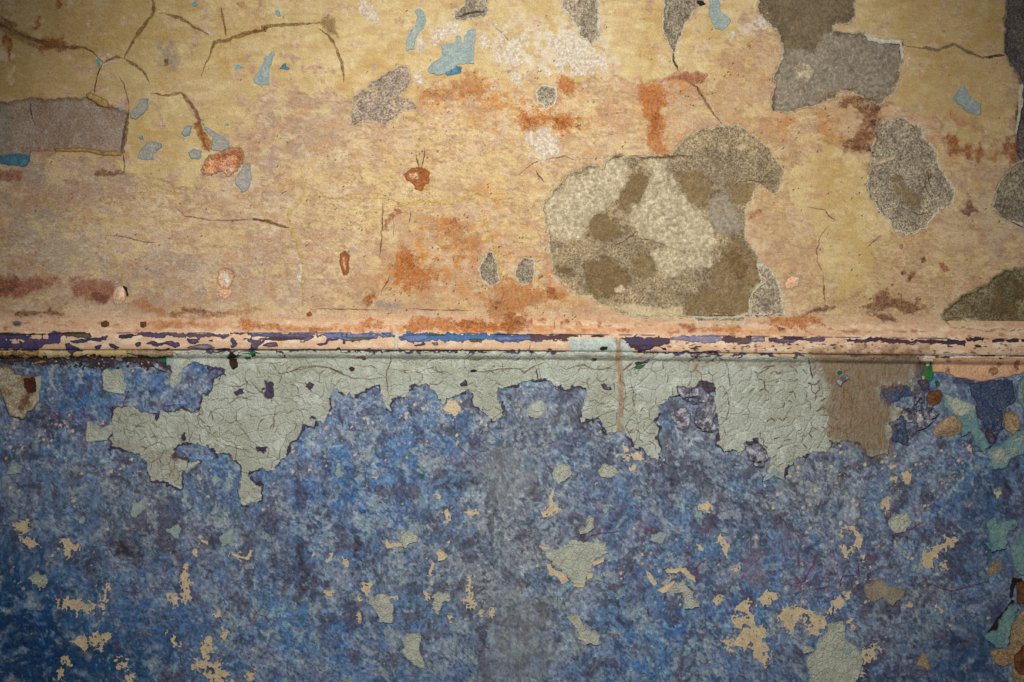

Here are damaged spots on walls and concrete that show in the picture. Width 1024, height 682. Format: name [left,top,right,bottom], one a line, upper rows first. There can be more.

spalling [756,0,906,114]
crack [854,43,1005,74]
spalling [0,92,162,167]
crack [2,1,511,310]
rust [518,111,582,130]
rust [637,85,669,155]
rust [841,96,881,153]
spalling [992,0,1024,227]
rust [403,275,559,334]
peeling [0,117,1024,509]
crack [115,320,902,480]
peeling [720,589,887,682]